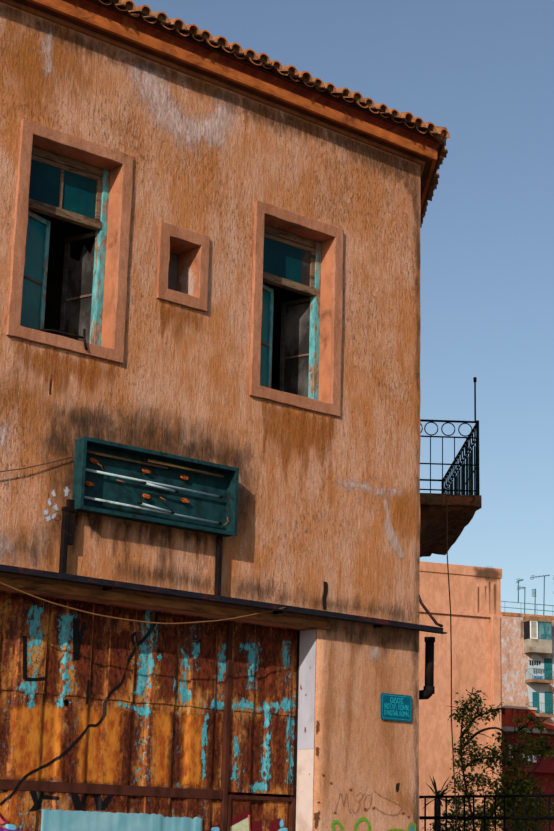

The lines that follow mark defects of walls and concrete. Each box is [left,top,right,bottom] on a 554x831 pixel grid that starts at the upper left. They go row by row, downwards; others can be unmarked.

leakage [131,62,420,269]
peeling [16,603,44,709]
peeling [56,613,77,709]
rust [60,705,78,783]
peeling [118,610,162,717]
rust [70,712,223,814]
rust [0,592,297,701]
peeling [173,642,200,704]
rust [240,717,263,784]
peeling [201,641,306,794]
rust [273,717,287,787]